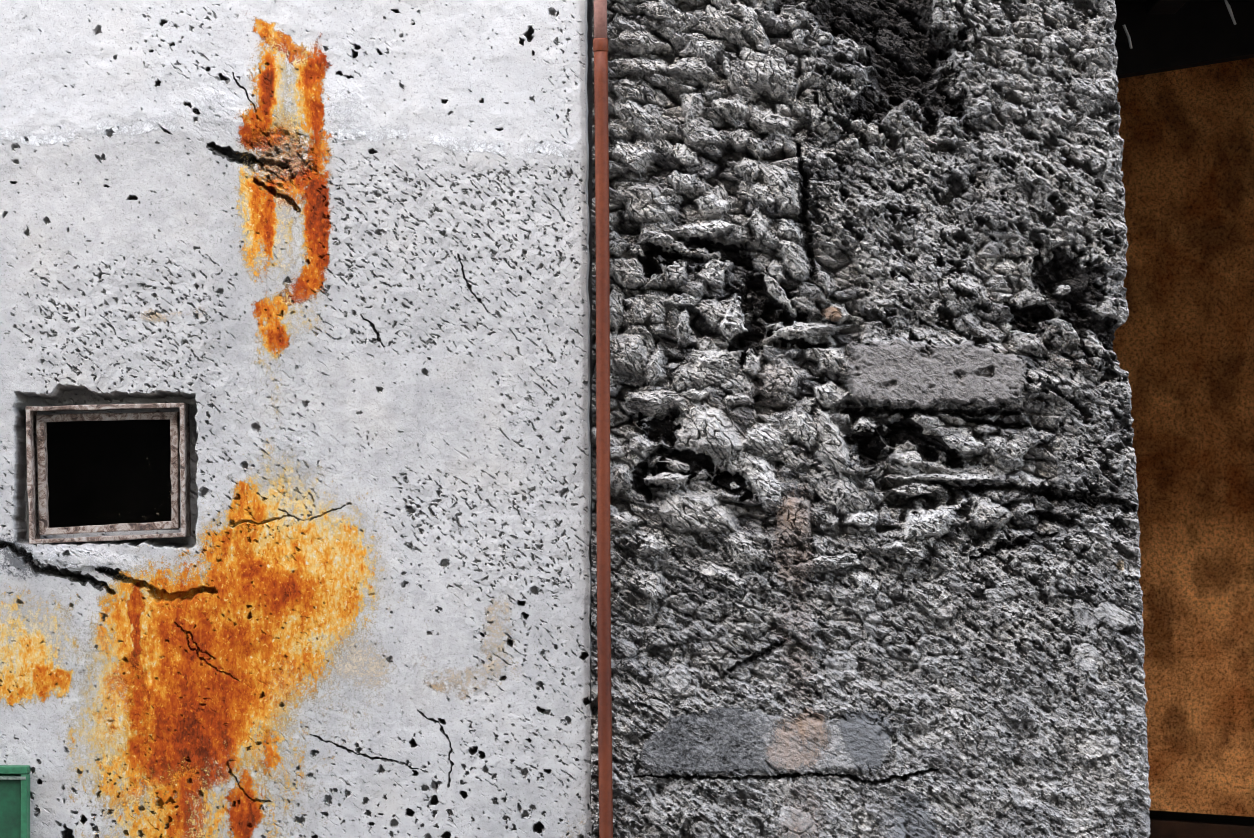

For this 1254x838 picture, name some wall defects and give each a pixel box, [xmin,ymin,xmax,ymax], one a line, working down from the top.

crack [206,141,301,212]
rust [0,12,403,838]
crack [0,540,155,595]
crack [310,709,454,788]